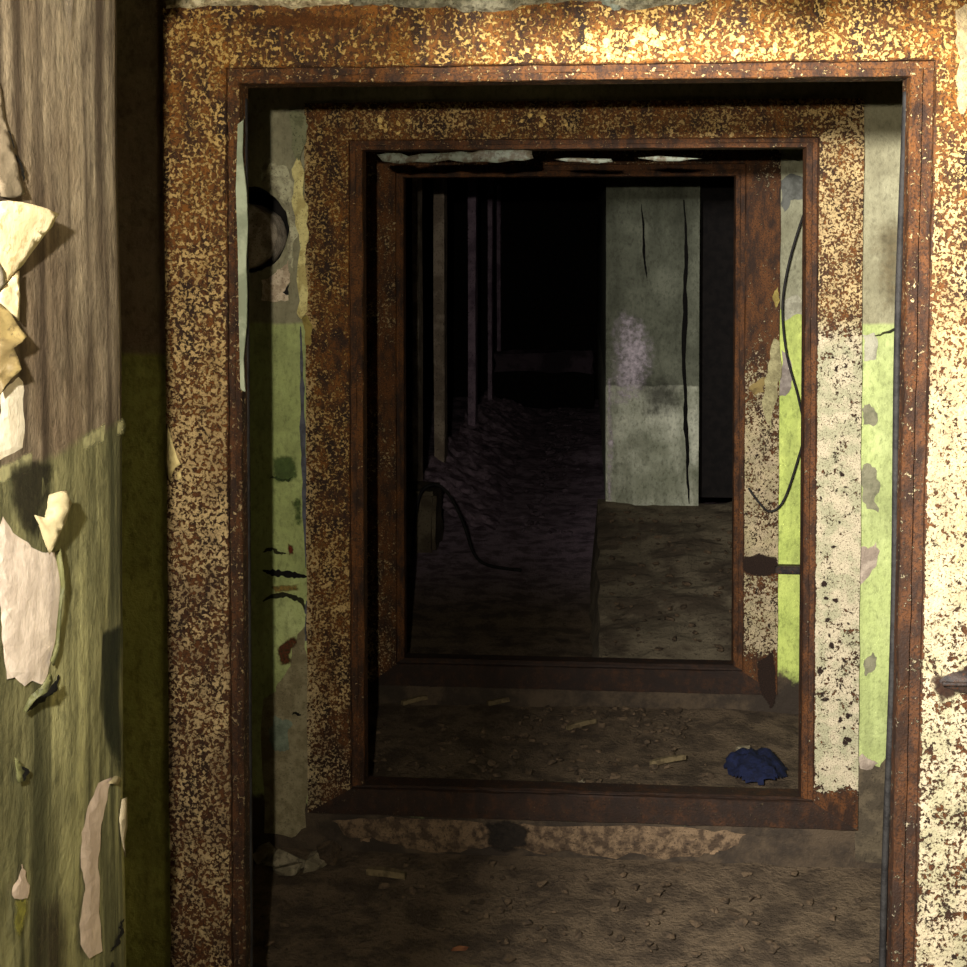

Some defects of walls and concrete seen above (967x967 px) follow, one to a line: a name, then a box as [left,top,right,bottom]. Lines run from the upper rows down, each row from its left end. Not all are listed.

peeling [0,86,59,460]
peeling [0,490,72,713]
rust [742,553,777,603]
rust [278,637,297,665]
rust [758,652,776,708]
rust [931,675,962,702]
rust [838,713,852,746]
peeling [14,757,30,783]
peeling [119,797,128,857]
peeling [12,864,30,935]
peeling [79,776,124,967]